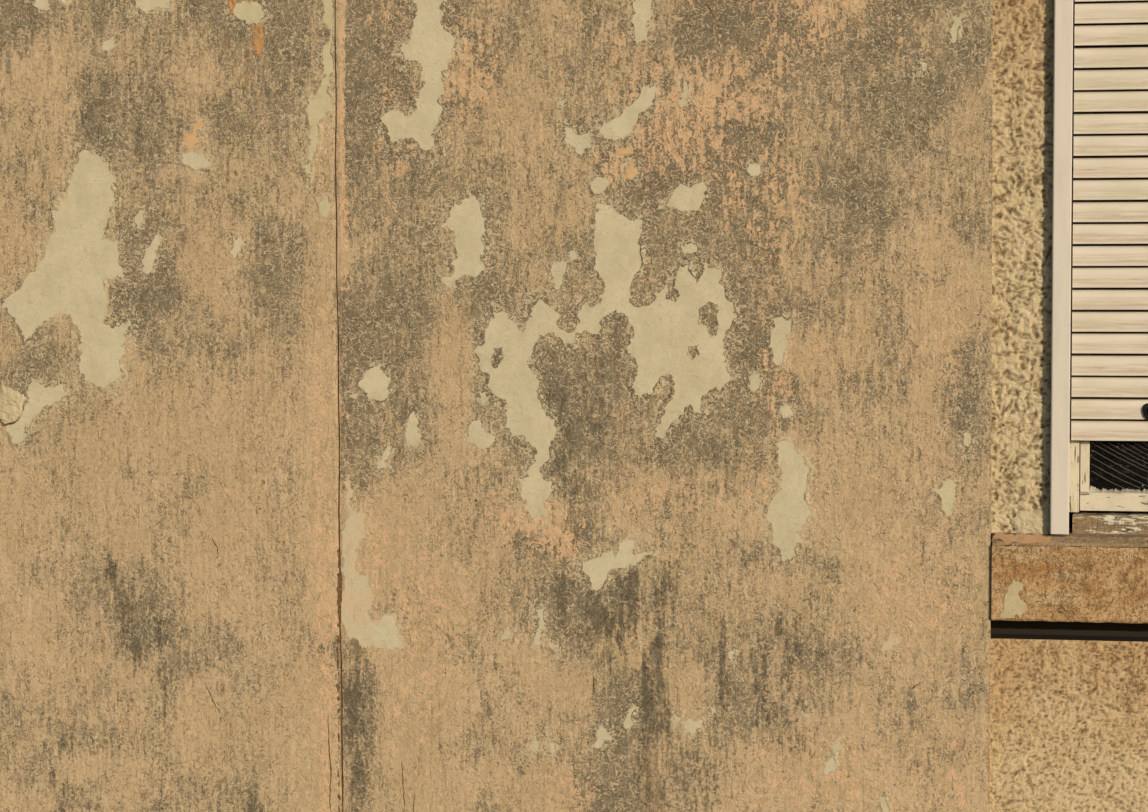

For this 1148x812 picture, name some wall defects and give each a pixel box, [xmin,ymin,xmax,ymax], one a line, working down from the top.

peeling [376,0,460,155]
peeling [947,13,965,46]
peeling [0,145,163,394]
peeling [437,191,492,292]
peeling [464,82,796,523]
peeling [0,375,71,448]
water stain [108,555,142,674]
peeling [341,480,403,651]
water stain [585,569,638,670]
peeling [577,535,658,594]
peeling [762,435,816,566]
water stain [638,575,676,808]